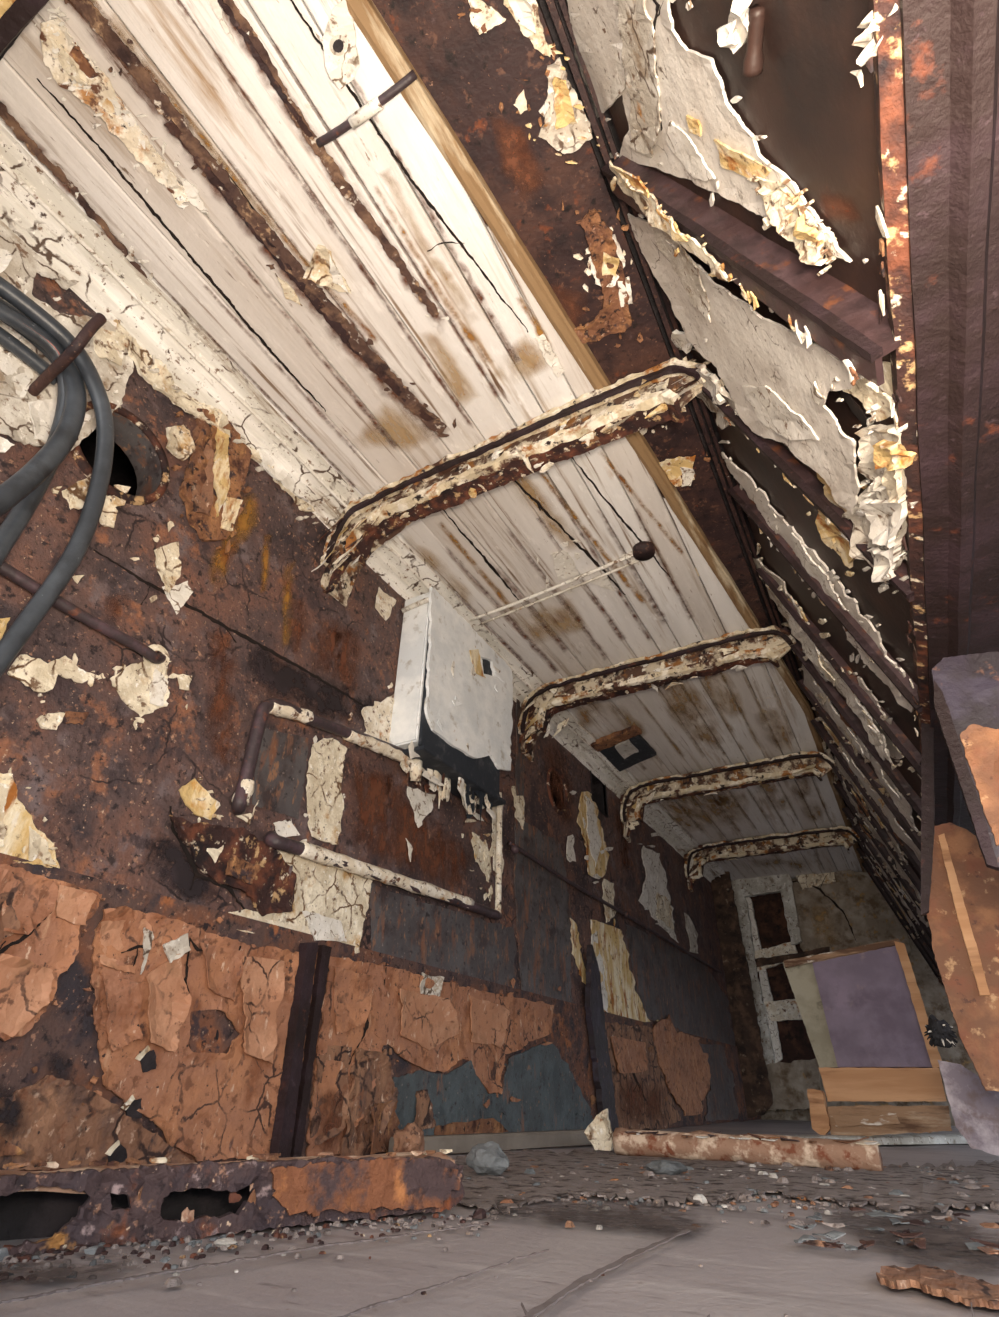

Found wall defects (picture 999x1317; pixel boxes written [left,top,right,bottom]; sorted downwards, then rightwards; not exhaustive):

spalling [35,0,456,437]
spalling [0,220,367,573]
corrosion [390,311,470,423]
corrosion [402,266,497,394]
peeling [457,0,929,939]
peeling [0,727,596,1171]
peeling [566,790,735,1130]
corrosion [2,1157,171,1170]
corrosion [180,1207,194,1223]
corrosion [247,1096,460,1217]
crack [339,1249,549,1317]
crack [521,1229,690,1317]